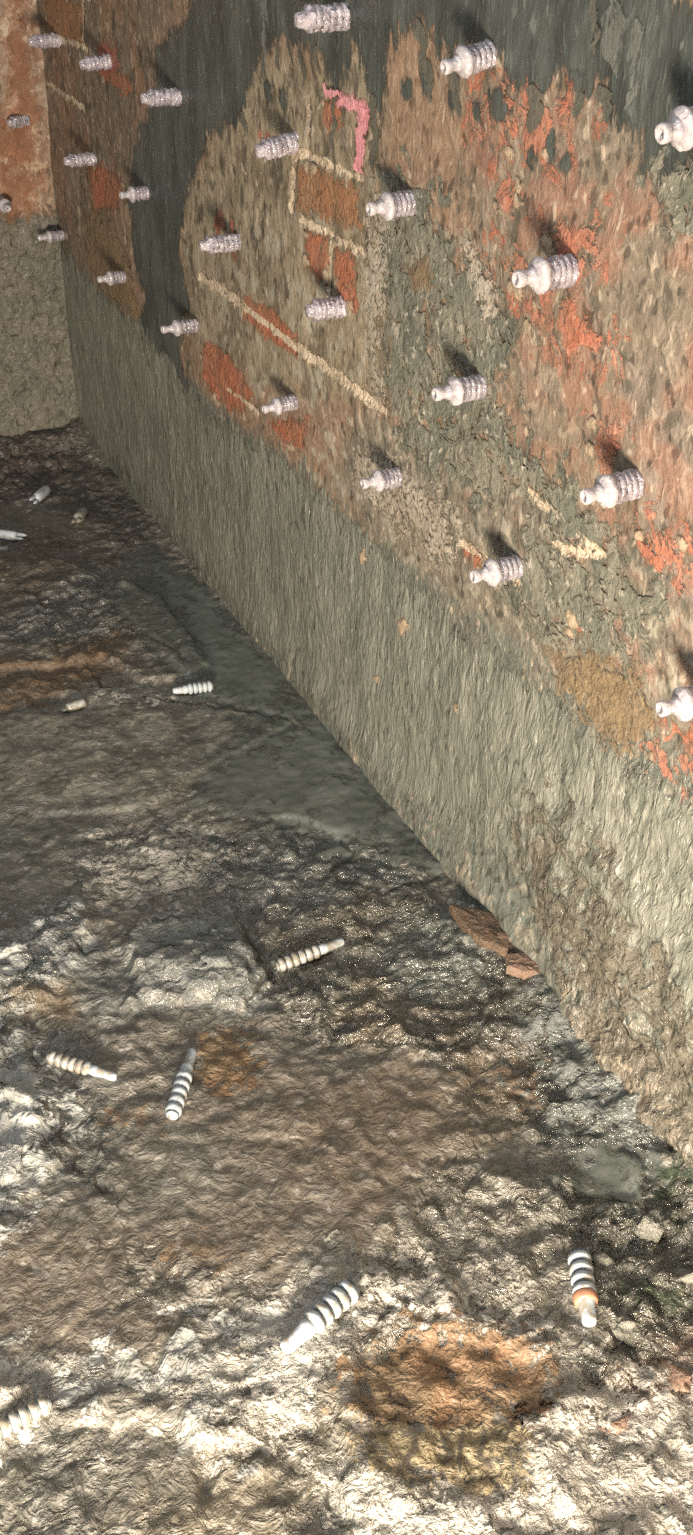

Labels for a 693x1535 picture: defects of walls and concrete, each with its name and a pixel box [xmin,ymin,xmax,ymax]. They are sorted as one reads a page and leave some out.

spalling [43,0,85,47]
spalling [87,163,125,214]
spalling [296,159,363,314]
spalling [460,68,635,474]
spalling [240,292,298,358]
spalling [200,341,254,414]
spalling [268,414,309,451]
spalling [624,496,693,621]
peeling [398,618,410,636]
spalling [565,609,589,644]
spalling [634,715,693,804]
corrosion [320,1305,570,1504]